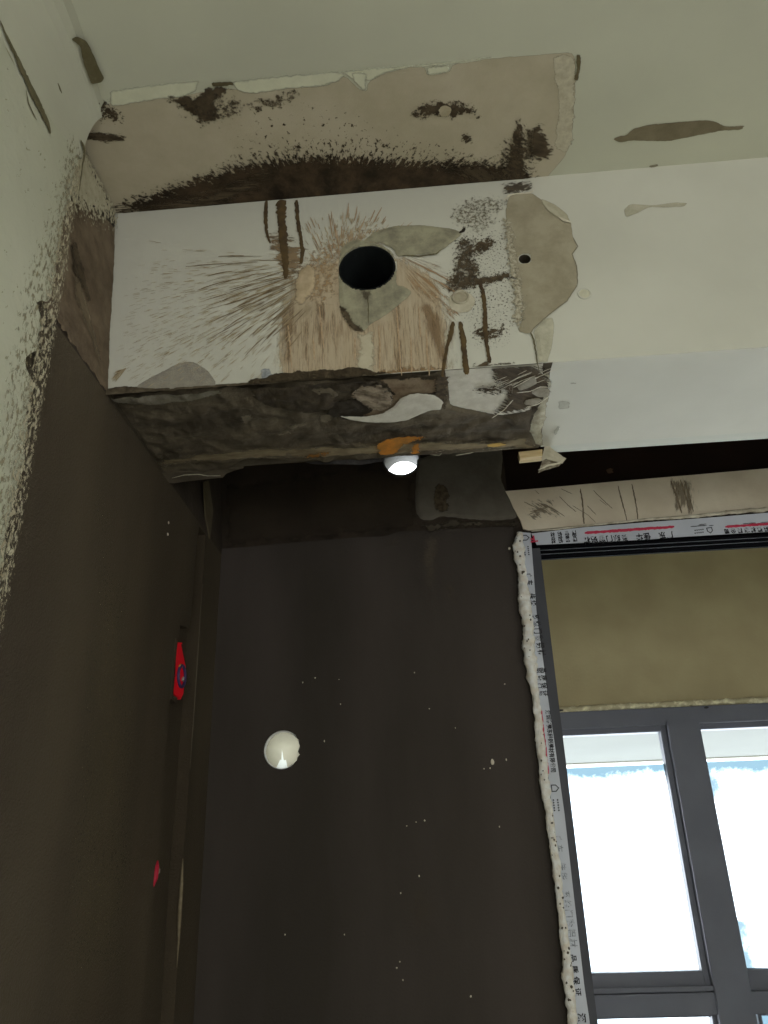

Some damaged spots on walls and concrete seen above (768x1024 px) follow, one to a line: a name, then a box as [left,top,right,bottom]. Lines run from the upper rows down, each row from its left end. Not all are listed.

peeling [72,37,104,84]
peeling [614,120,744,142]
damp [112,86,538,387]
peeling [0,53,578,631]
corrosion [377,436,424,455]